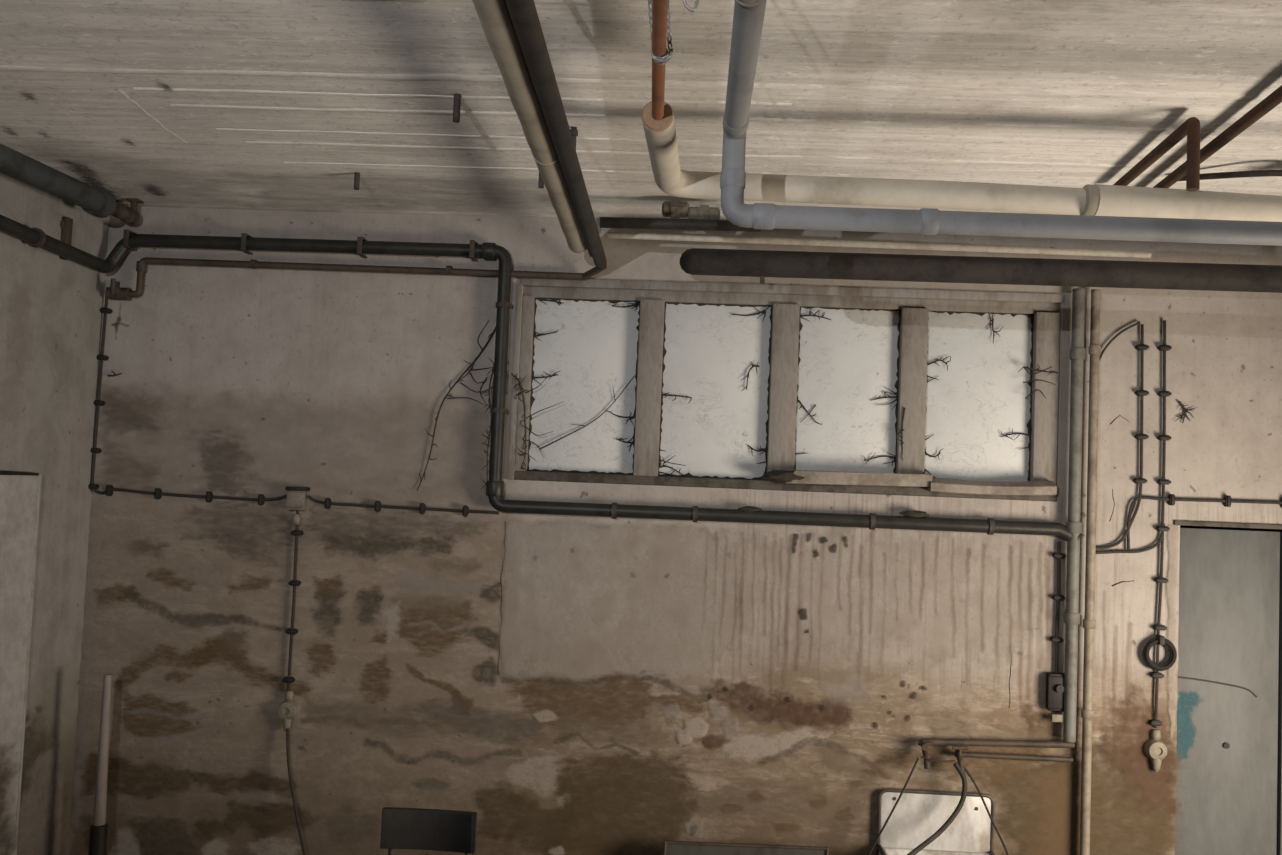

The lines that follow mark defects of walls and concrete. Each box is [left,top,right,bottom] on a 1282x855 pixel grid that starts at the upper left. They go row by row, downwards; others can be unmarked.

leakage [792,533,848,558]
leakage [309,580,470,673]
leakage [117,615,310,736]
leakage [408,668,651,741]
peeling [534,711,555,722]
peeling [654,696,728,749]
leakage [83,755,312,855]
leakage [477,755,697,855]
leakage [855,689,1182,855]